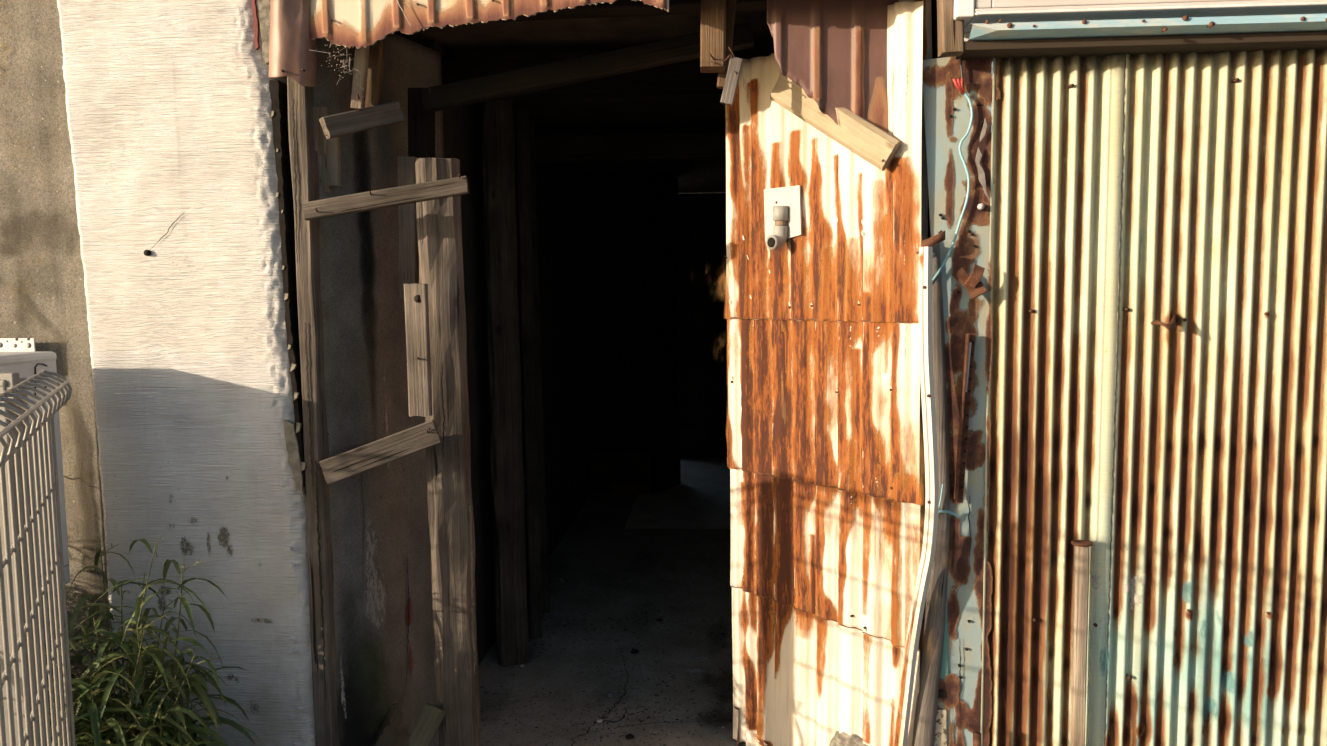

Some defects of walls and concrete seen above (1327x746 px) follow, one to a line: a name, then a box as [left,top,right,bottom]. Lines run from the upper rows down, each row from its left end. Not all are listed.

corrosion [310,0,615,48]
corrosion [642,0,667,10]
corrosion [725,0,1096,746]
corrosion [1105,52,1327,746]
crack [571,643,689,746]